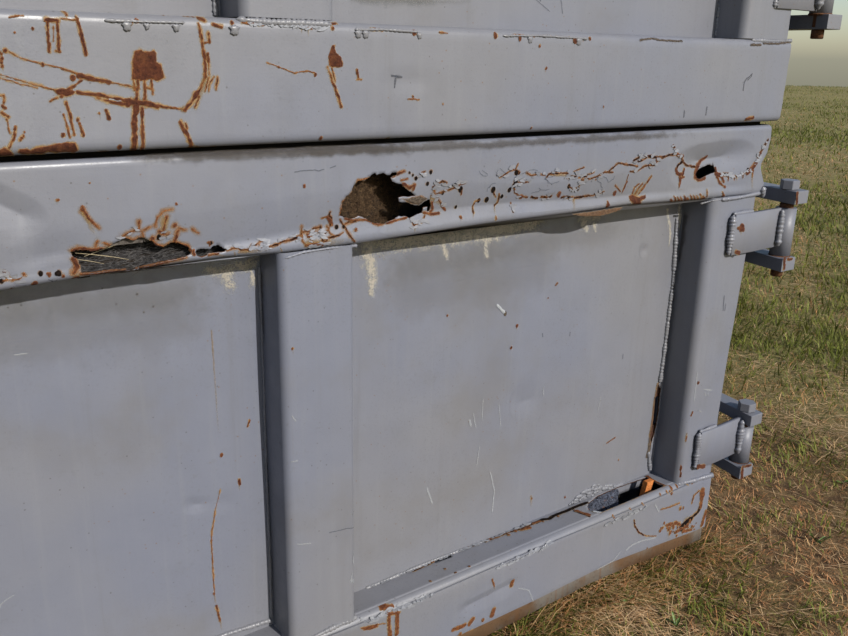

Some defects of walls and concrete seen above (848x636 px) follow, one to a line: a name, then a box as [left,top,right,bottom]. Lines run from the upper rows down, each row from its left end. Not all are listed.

rust [0,11,264,157]
rust [622,174,652,205]
rust [670,167,708,202]
peeling [110,226,148,246]
rust [659,465,707,537]
rust [361,603,401,636]
rust [451,607,496,636]